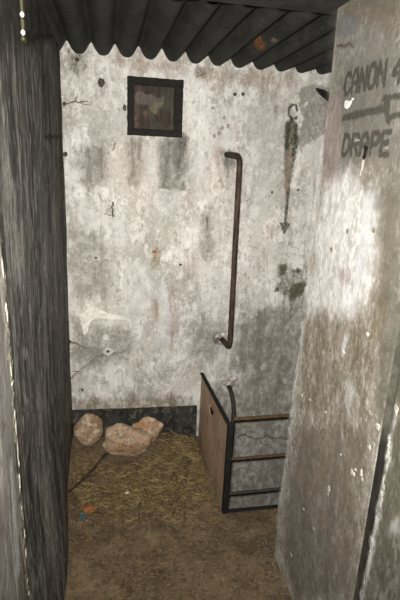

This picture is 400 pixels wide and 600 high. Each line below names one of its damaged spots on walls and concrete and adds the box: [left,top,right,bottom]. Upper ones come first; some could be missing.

crack [62,97,90,106]
crack [69,340,124,378]
water stain [216,264,306,509]
crack [236,434,289,446]